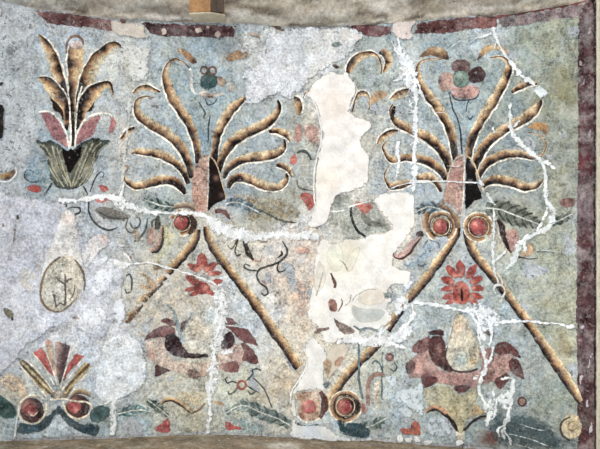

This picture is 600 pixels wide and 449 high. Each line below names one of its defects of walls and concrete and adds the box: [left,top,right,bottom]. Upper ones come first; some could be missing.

crack [111,253,233,434]
crack [58,113,319,243]
flaking render [239,27,371,227]
flaking render [287,192,415,441]
crack [337,37,575,445]
crack [478,27,535,86]